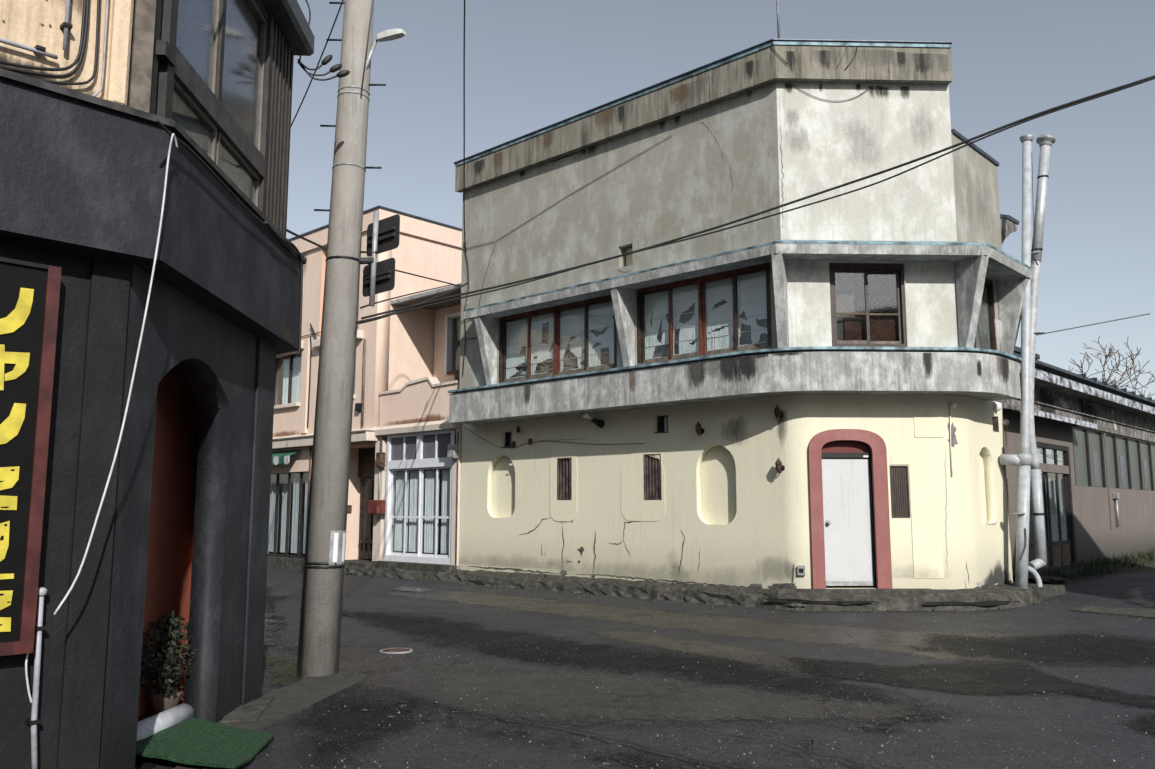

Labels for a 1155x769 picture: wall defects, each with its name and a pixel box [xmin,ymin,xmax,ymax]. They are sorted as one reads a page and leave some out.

leakage [820,50,830,66]
leakage [897,52,930,72]
leakage [856,84,909,97]
leakage [689,362,705,385]
leakage [721,352,798,380]
leakage [923,353,932,375]
leakage [977,355,1009,379]
crack [469,514,747,588]